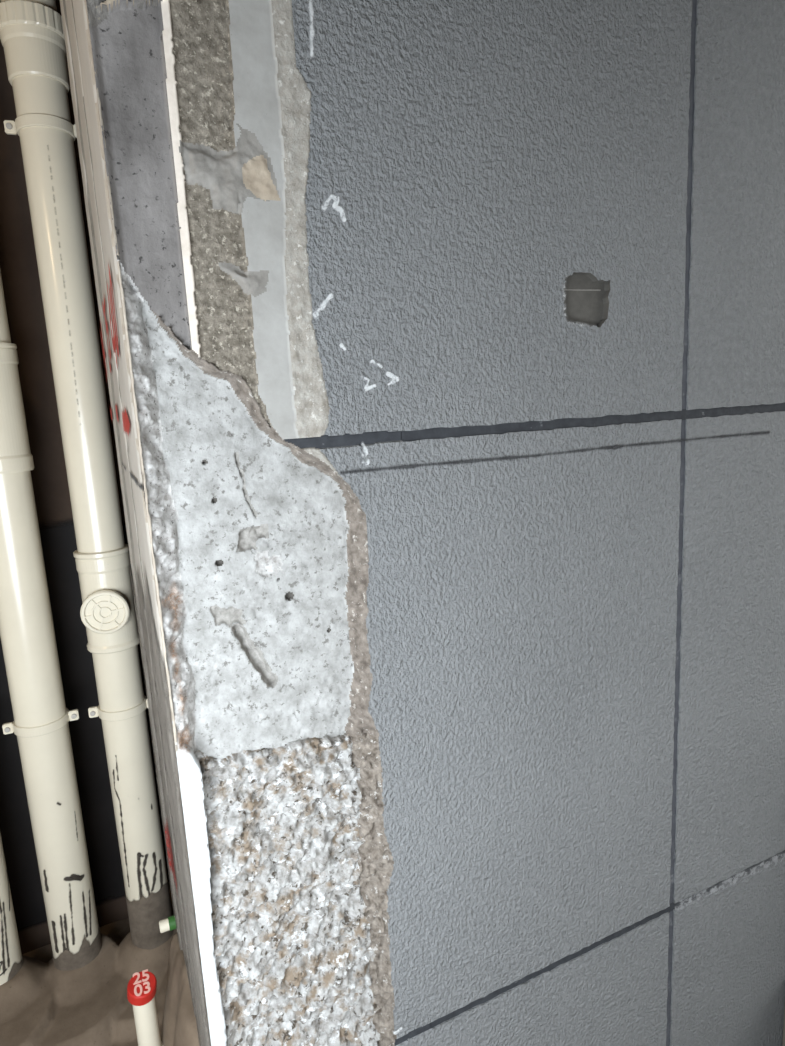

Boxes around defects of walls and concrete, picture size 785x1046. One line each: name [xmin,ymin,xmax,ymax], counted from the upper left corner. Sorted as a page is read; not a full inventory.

spalling [89,0,397,1046]
spalling [563,272,610,328]